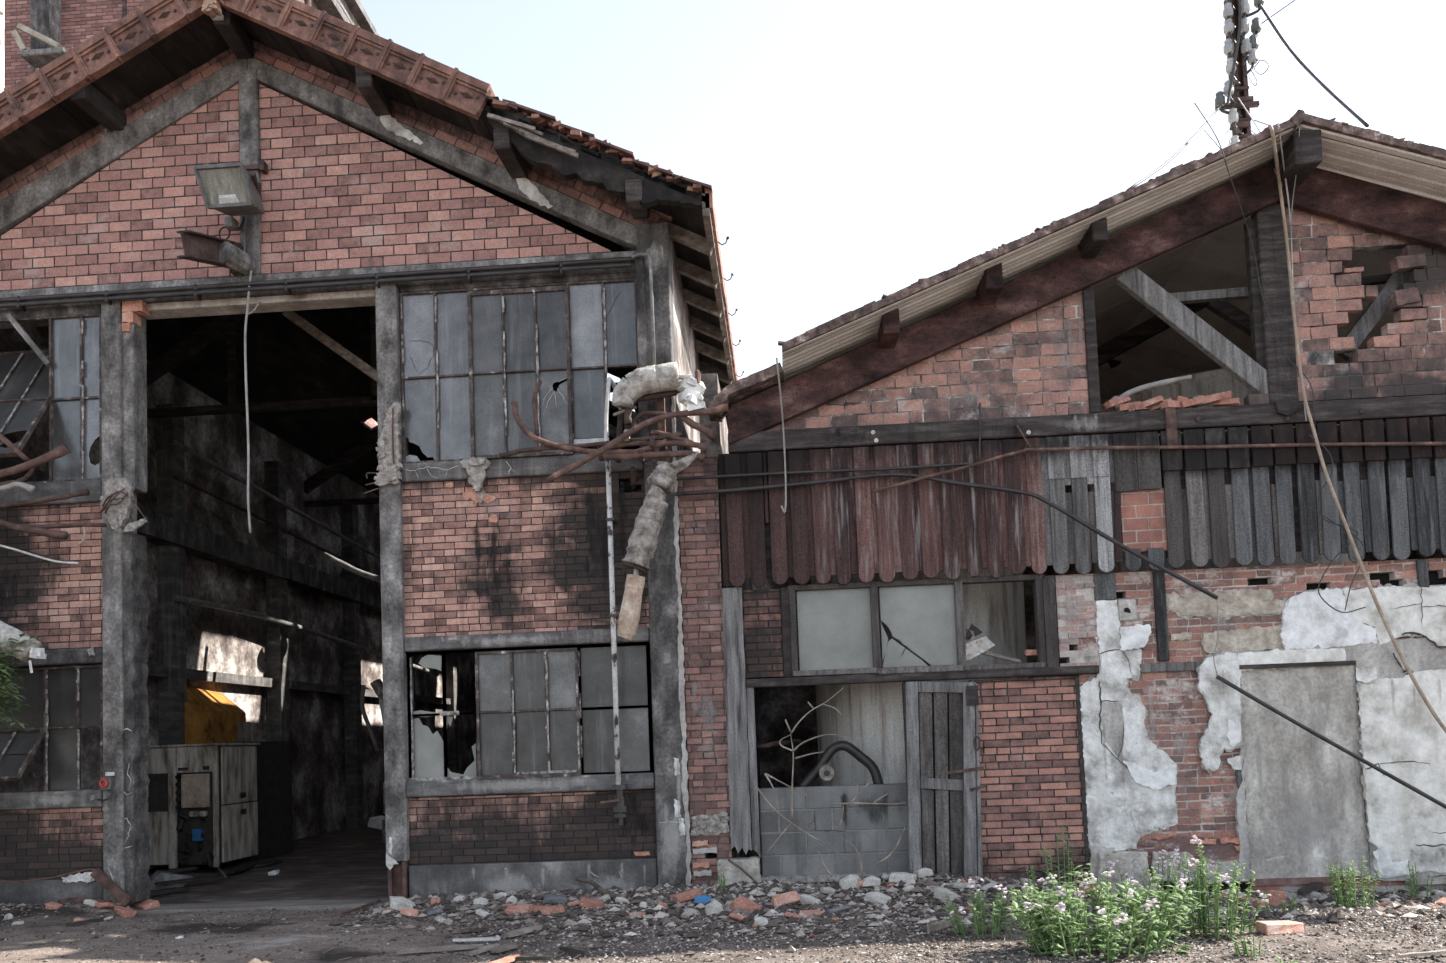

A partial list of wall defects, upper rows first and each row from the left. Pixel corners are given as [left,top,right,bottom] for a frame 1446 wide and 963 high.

damp [475,527,508,579]
peeling [1080,600,1240,881]
peeling [1166,583,1446,880]